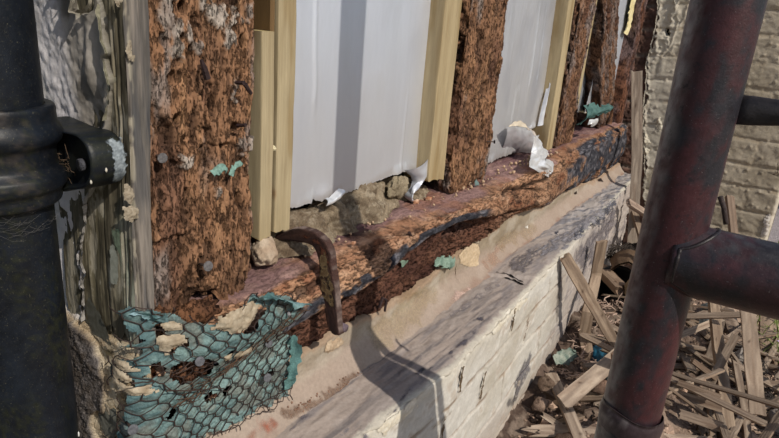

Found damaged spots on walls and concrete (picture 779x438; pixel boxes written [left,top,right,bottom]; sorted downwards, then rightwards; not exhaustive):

peeling [68,0,111,121]